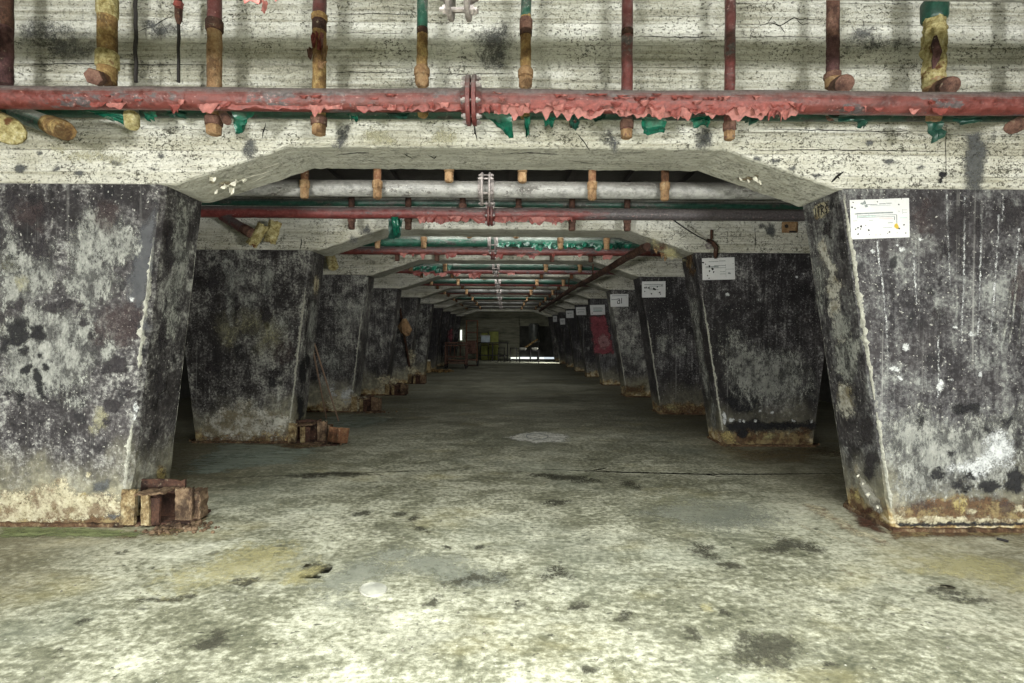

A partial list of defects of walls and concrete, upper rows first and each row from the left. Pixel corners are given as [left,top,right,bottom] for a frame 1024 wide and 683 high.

peeling [299,95,340,117]
peeling [366,94,413,110]
peeling [478,92,807,121]
peeling [416,216,569,226]
damp [936,197,1023,312]
damp [202,399,292,441]
rust [718,428,840,463]
rust [847,488,1024,540]